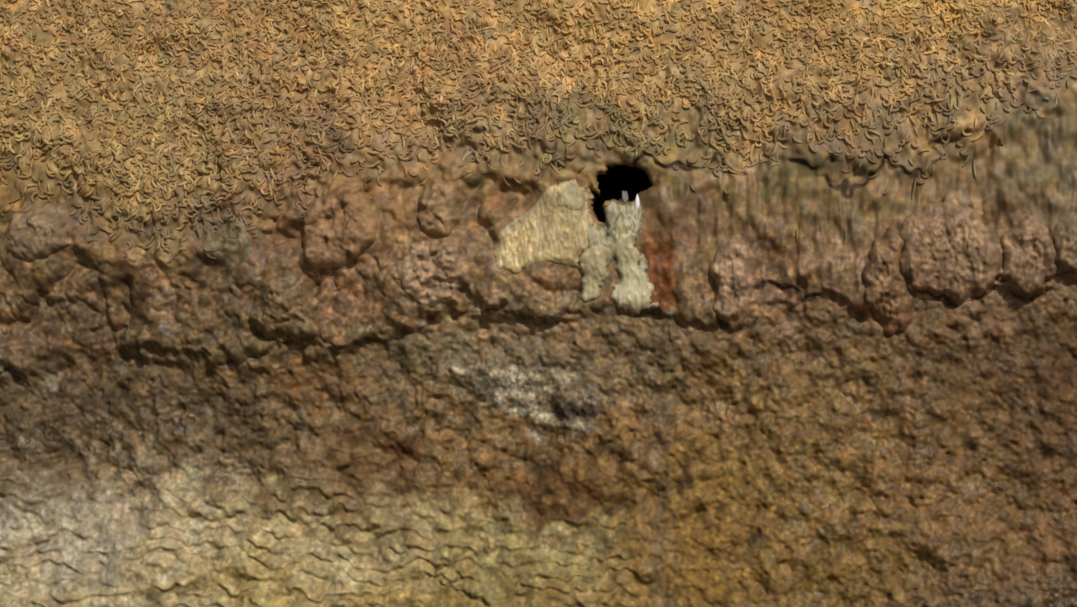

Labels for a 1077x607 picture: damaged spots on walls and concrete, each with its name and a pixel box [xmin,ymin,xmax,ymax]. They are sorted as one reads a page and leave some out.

peeling [494,180,655,314]
rust [645,225,676,310]
crack [755,282,817,301]
crack [916,279,1005,307]